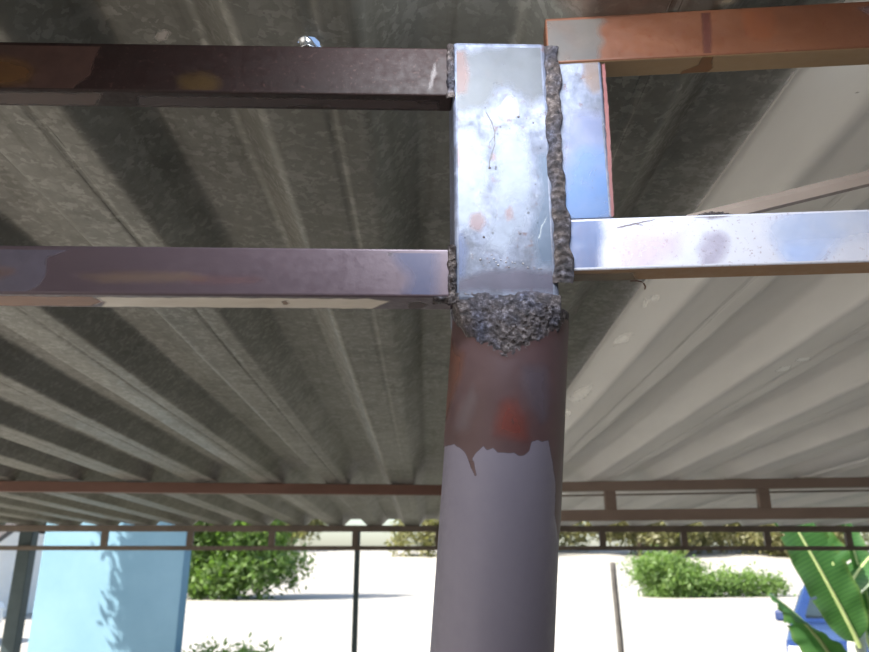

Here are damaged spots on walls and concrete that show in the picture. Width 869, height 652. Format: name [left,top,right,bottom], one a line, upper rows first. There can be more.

rust [681,13,713,74]
crack [486,113,496,167]
rust [443,319,569,539]